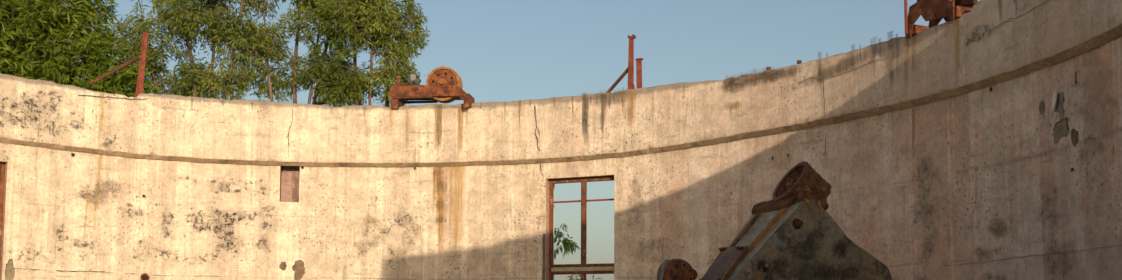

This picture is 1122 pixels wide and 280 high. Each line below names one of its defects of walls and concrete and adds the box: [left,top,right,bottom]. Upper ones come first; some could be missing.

water stain [726,67,797,91]
water stain [819,31,897,80]
spalling [1039,92,1078,146]
water stain [129,175,281,270]
rust [433,166,464,241]
spalling [5,259,15,280]
spalling [279,258,306,280]